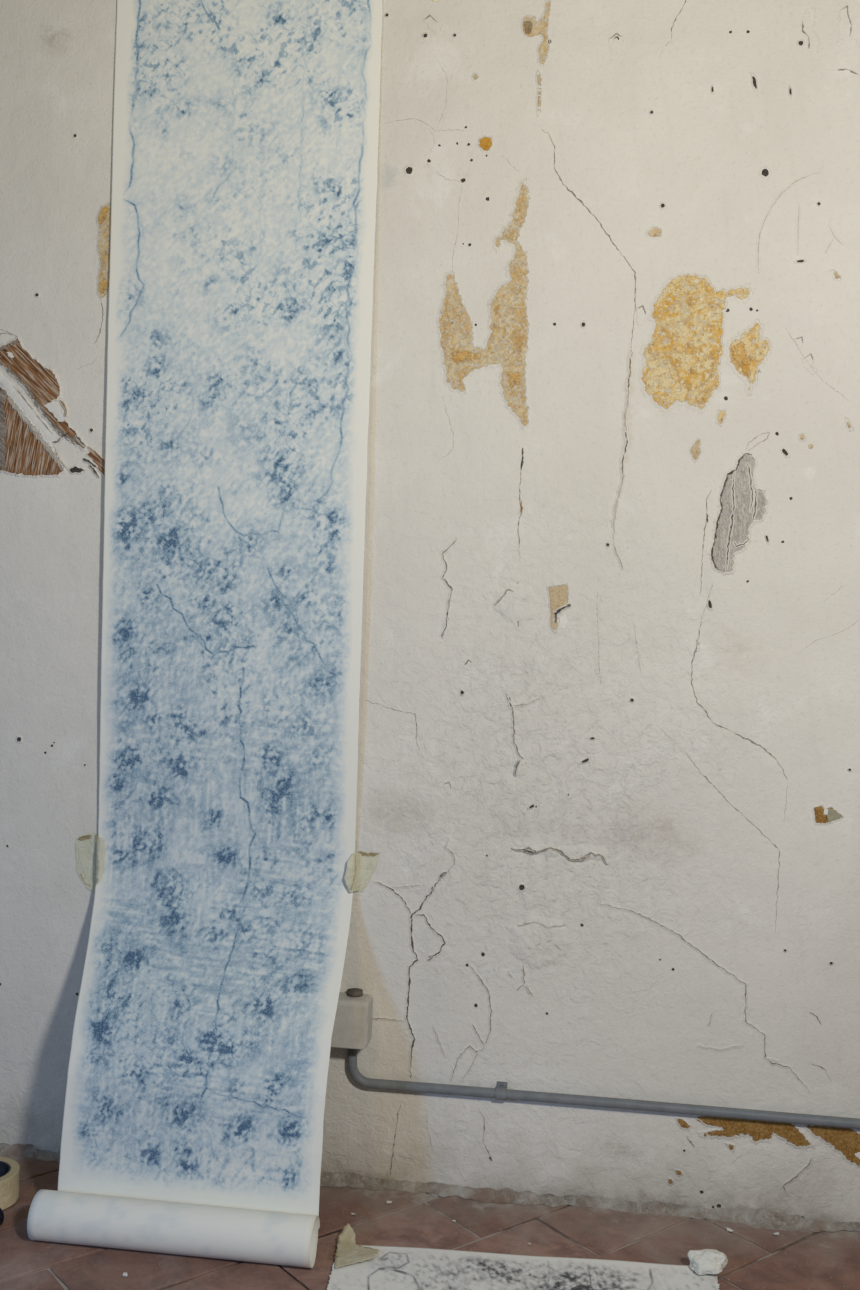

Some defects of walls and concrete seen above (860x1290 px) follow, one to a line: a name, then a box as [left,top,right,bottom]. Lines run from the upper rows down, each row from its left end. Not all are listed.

flaking render [0,336,105,479]
peeling [96,202,111,301]
peeling [436,177,533,431]
crack [546,132,636,570]
peeling [637,270,773,427]
crack [516,448,524,584]
flaking render [707,450,784,583]
peeling [546,582,572,634]
peeling [811,803,845,826]
crack [372,837,535,1083]
crack [600,902,826,1095]
peeling [674,1115,860,1169]